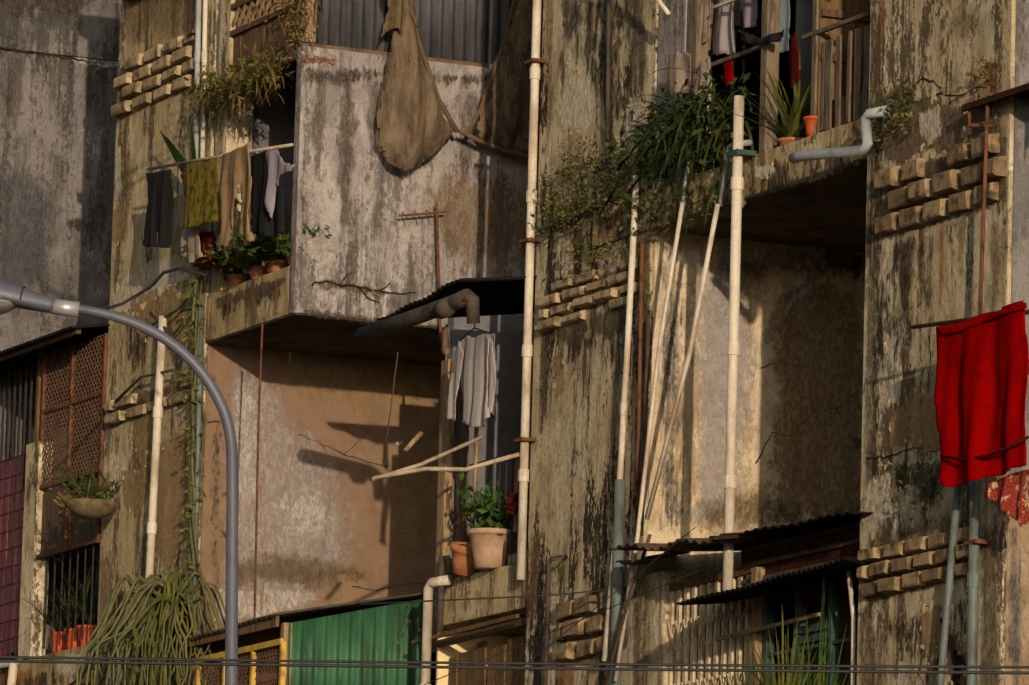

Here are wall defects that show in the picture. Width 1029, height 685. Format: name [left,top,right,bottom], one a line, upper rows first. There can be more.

leakage [546,0,647,140]
spalling [882,92,1002,166]
leakage [216,277,285,327]
crack [298,246,416,303]
leakage [539,125,940,528]
peeling [861,328,942,541]